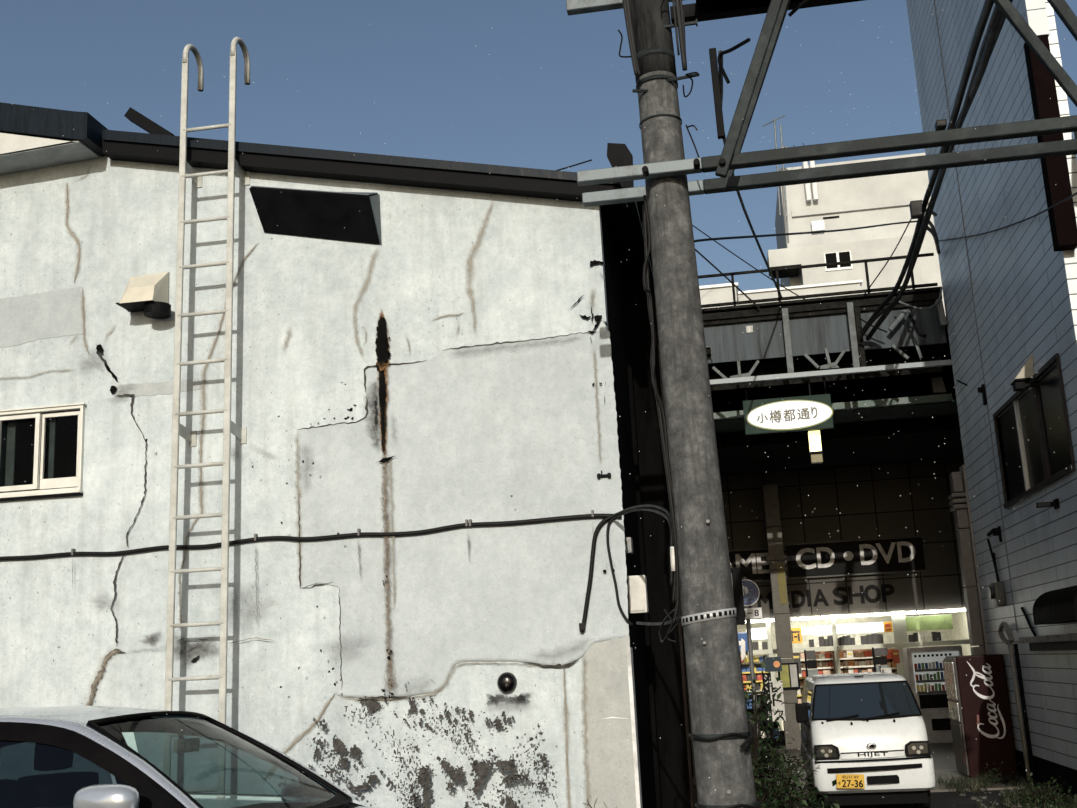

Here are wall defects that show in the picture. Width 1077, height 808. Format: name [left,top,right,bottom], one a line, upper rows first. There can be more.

crack [0,174,147,706]
corrosion [374,311,409,700]
peeling [306,696,558,808]